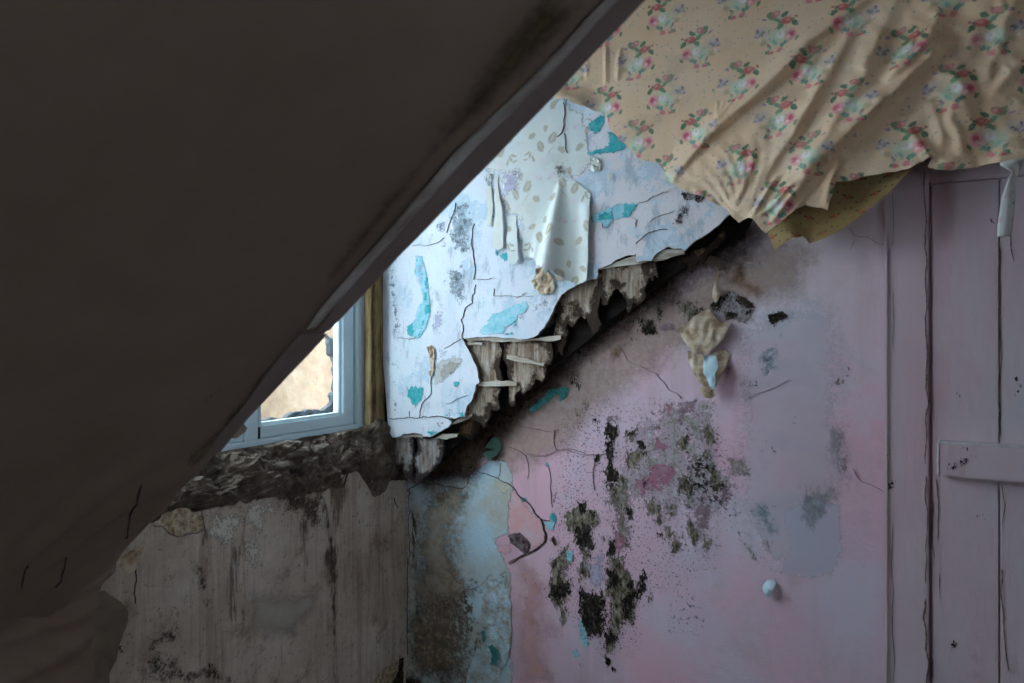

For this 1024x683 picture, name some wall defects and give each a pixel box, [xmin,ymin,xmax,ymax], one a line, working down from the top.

damp [437,203,472,252]
crack [413,203,529,348]
flaking render [681,191,705,203]
peeling [427,345,435,377]
damp [406,230,796,683]
damp [283,482,345,636]
spalling [146,419,556,683]
crack [406,422,603,654]
damp [143,629,231,682]